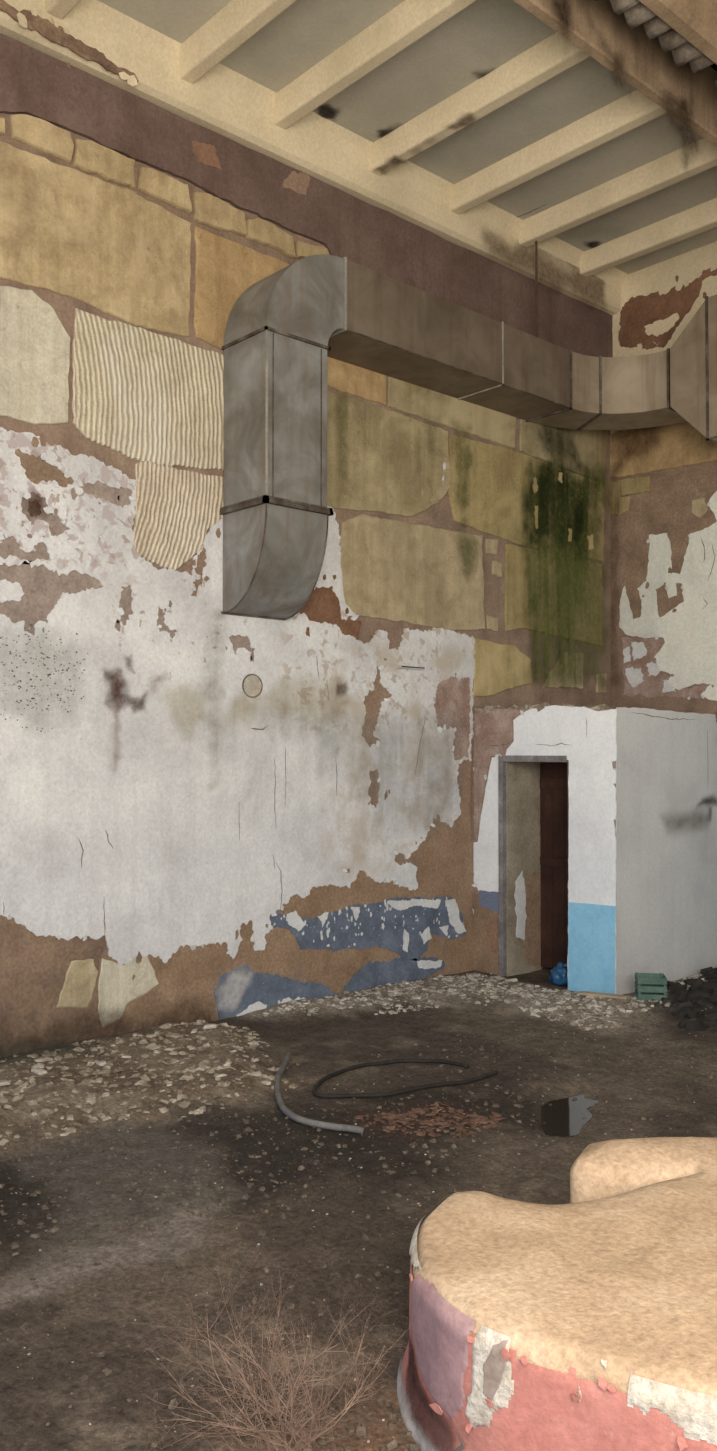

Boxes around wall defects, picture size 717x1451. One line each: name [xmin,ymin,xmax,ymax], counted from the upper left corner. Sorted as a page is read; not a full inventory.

peeling [0,0,139,87]
water stain [554,0,570,29]
water stain [666,97,698,164]
peeling [616,263,717,353]
water stain [526,427,584,541]
peeling [0,432,136,635]
peeling [190,528,221,596]
spalling [299,574,372,640]
spalling [568,461,717,722]
spalling [0,658,529,1059]
peeling [409,1193,528,1434]
peeling [598,1359,717,1451]